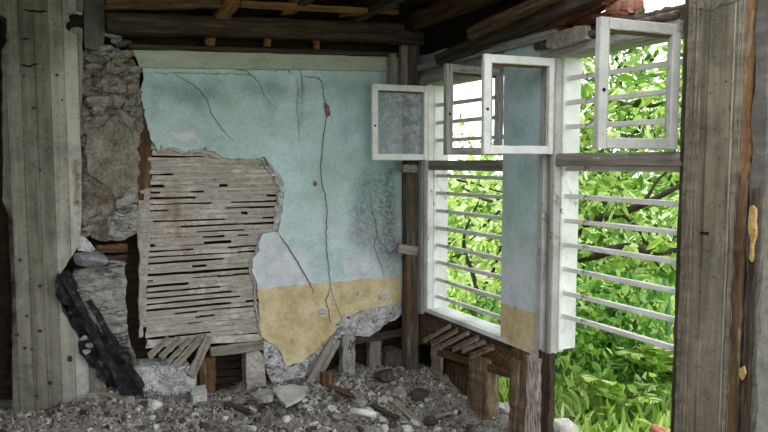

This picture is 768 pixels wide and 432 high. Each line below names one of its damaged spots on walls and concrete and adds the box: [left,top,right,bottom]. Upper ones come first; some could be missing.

peeling [77,235,96,252]
crack [152,69,341,323]
spalling [139,143,402,383]